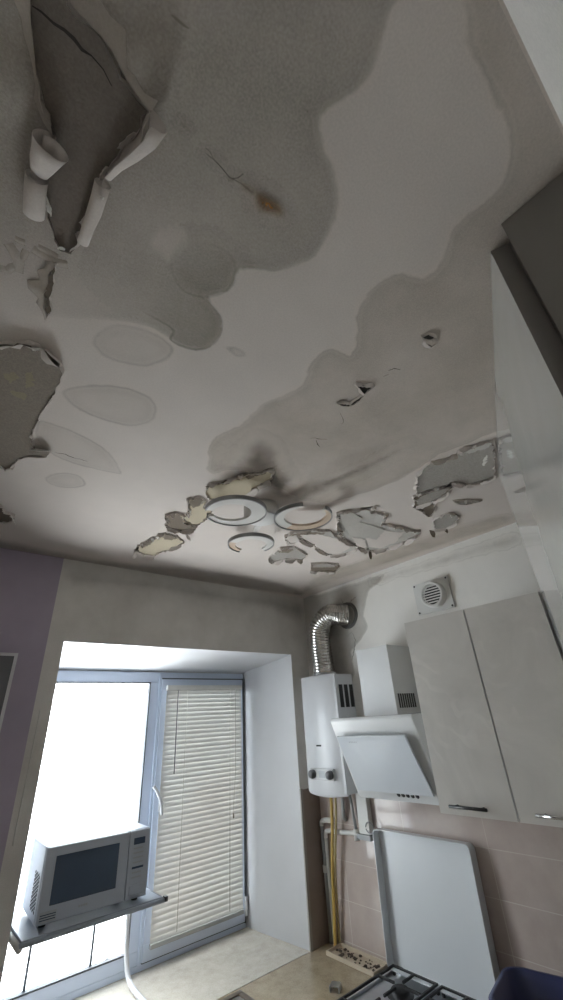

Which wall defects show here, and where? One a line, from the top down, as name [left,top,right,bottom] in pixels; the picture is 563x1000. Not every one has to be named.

crack [32,5,112,86]
peeling [0,339,65,471]
peeling [132,467,275,560]
peeling [268,439,498,575]